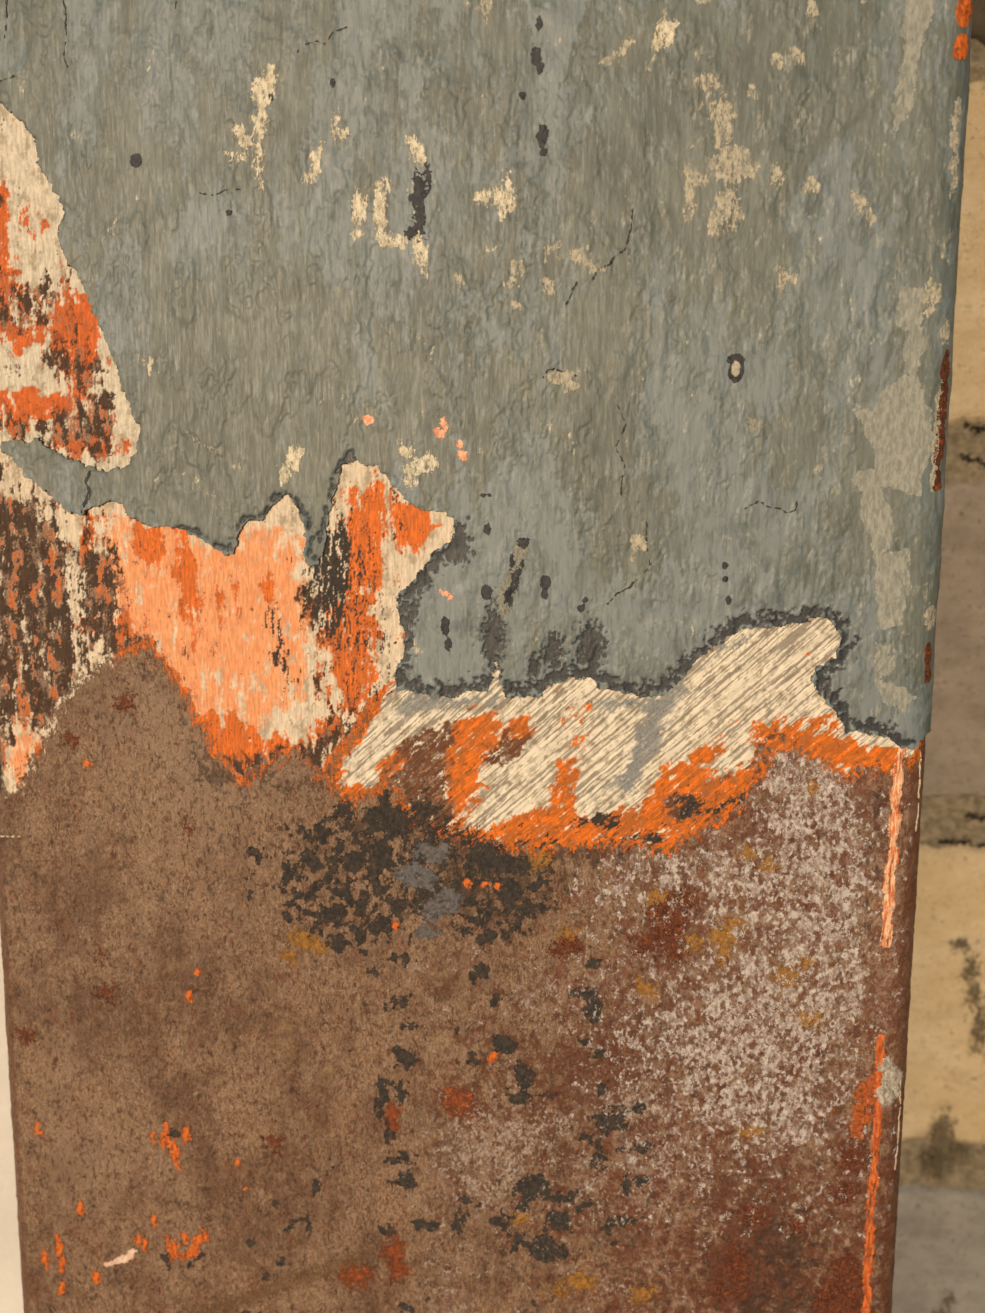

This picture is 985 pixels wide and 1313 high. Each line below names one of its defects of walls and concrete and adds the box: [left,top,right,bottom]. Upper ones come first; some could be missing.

peeling [530,47,545,75]
peeling [598,16,680,66]
peeling [770,43,805,73]
peeling [804,0,819,20]
peeling [223,62,279,191]
peeling [0,103,924,863]
rust [547,933,591,964]
rust [626,882,699,971]
rust [826,1070,883,1206]
rust [337,1225,416,1291]
rust [699,1201,817,1307]
rust [809,1246,864,1313]